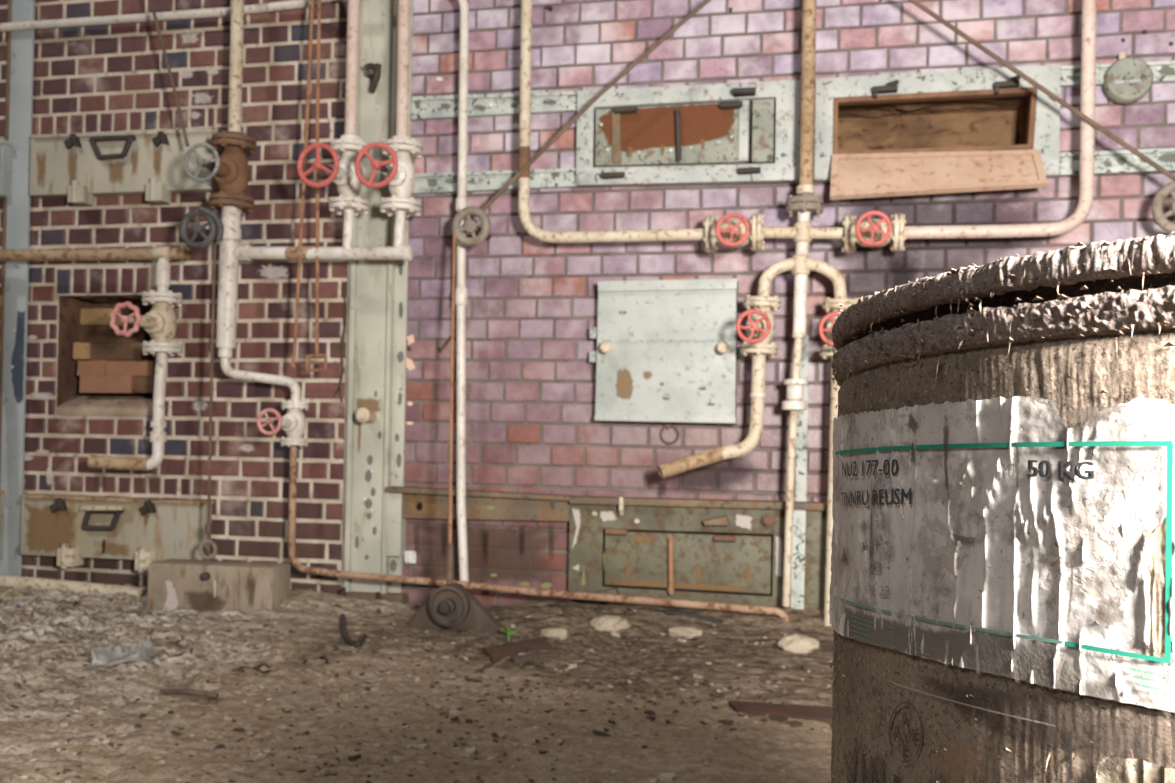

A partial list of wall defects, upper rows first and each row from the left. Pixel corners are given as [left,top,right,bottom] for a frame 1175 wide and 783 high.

rust [38,156,46,184]
rust [69,152,77,183]
rust [110,153,137,181]
rust [616,369,664,398]
rust [26,505,75,552]
rust [101,539,128,555]
rust [615,565,750,592]